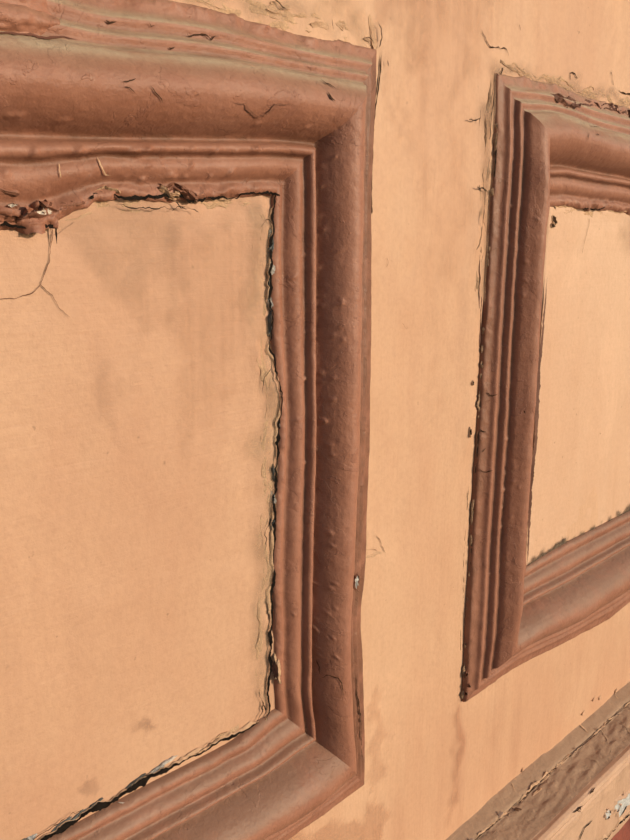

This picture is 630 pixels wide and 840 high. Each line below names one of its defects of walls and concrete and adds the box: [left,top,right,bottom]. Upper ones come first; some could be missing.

spalling [363,14,377,49]
peeling [552,93,630,118]
spalling [0,186,144,234]
peeling [158,183,250,209]
crack [2,222,74,315]
spalling [22,196,281,840]
crack [474,702,630,840]
peeling [603,790,630,820]